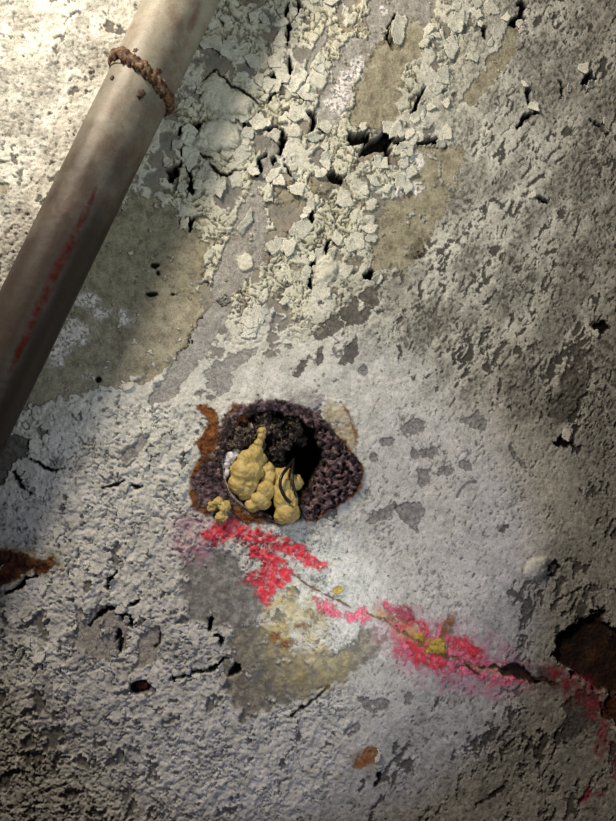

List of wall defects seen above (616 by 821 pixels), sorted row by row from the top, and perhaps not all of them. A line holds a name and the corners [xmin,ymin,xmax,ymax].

peeling [515,80,540,129]
flaking render [23,0,525,469]
flaking render [0,420,43,483]
rust [189,402,276,524]
spalling [233,410,370,520]
peeling [411,447,472,487]
rust [0,545,57,585]
peeling [76,538,136,588]
crack [289,571,560,686]
peeling [15,638,45,691]
rust [353,747,382,768]